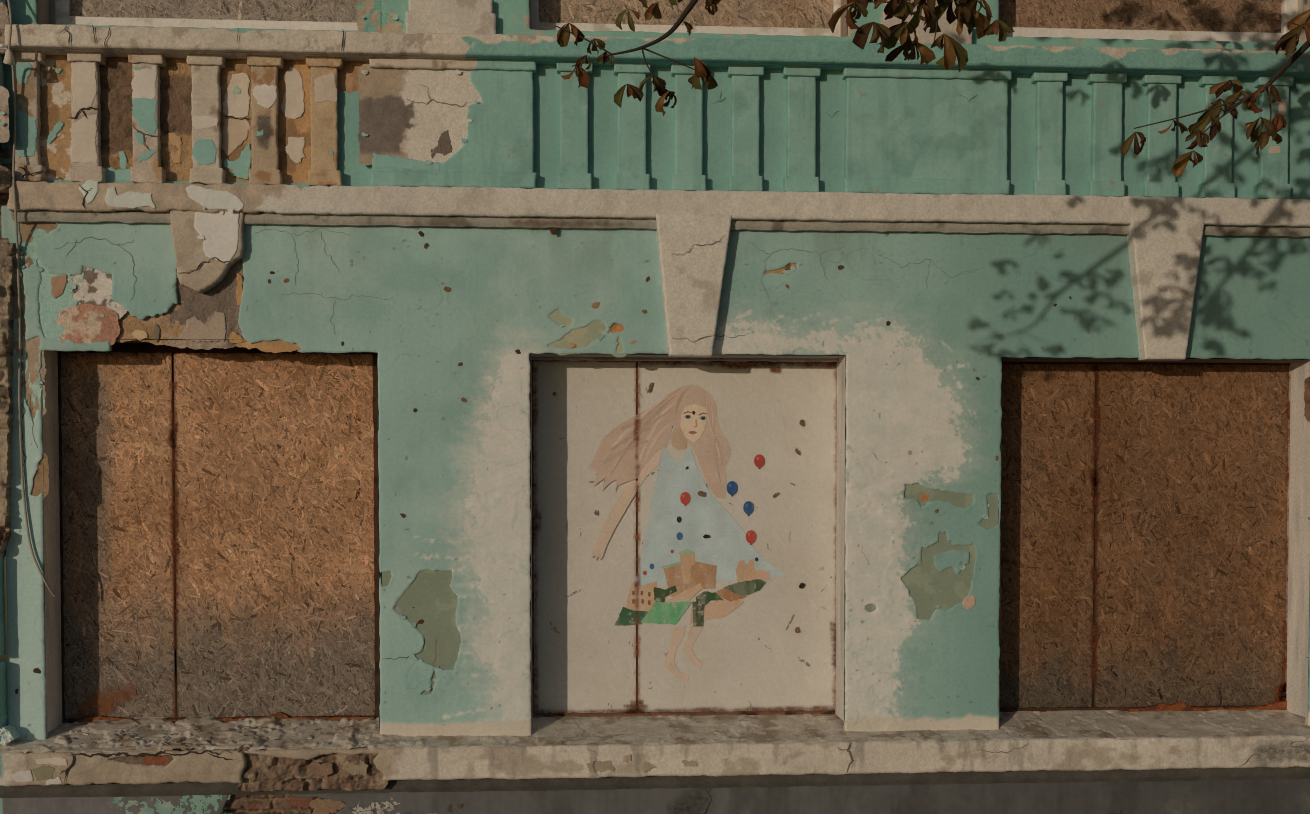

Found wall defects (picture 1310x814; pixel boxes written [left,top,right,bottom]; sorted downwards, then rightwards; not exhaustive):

peeling [0,0,483,558]
peeling [548,302,637,357]
peeling [904,483,998,530]
peeling [901,532,976,620]
peeling [394,570,462,695]
corrosion [77,715,183,723]
corrosion [208,712,374,722]
peeling [11,757,67,785]
flaking render [107,745,400,814]
peeling [586,754,656,773]